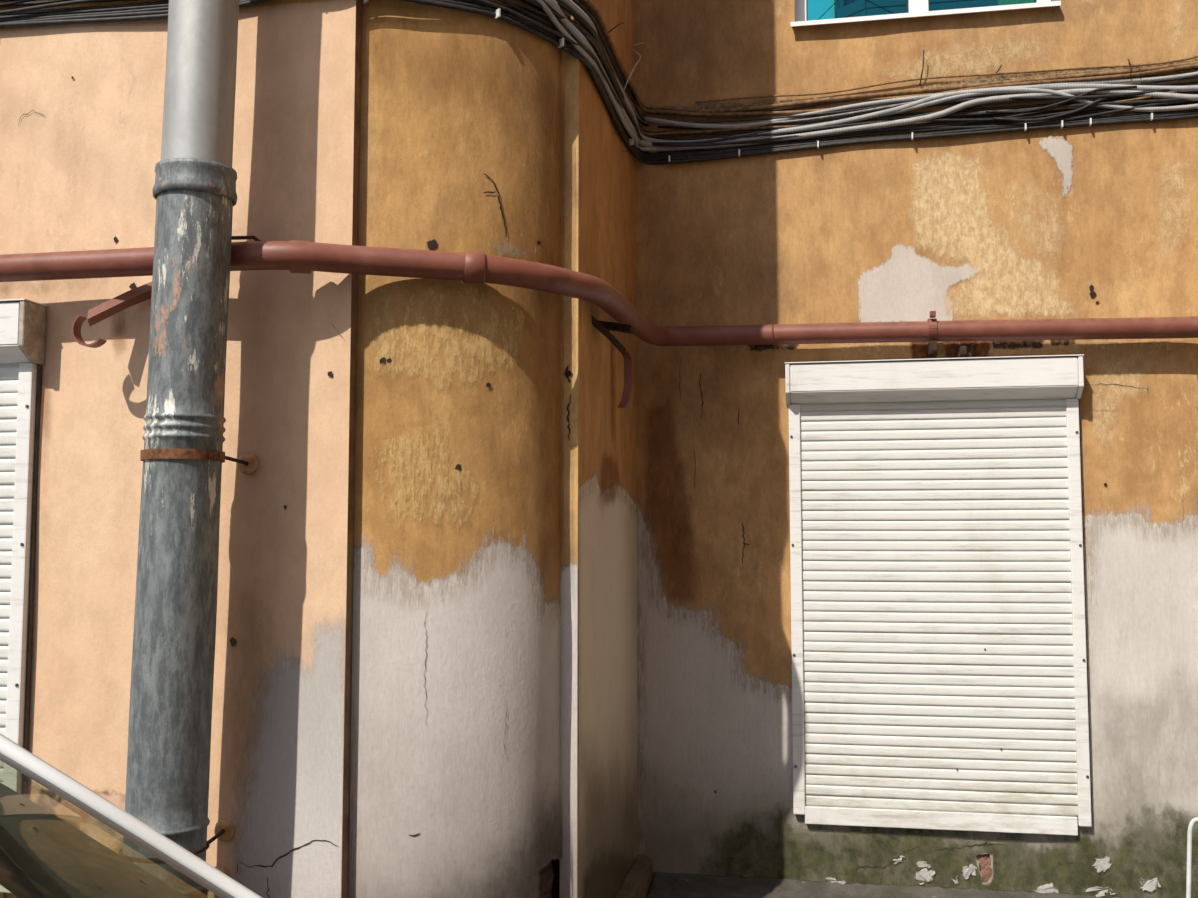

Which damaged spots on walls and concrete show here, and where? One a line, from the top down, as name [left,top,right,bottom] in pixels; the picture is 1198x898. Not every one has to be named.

peeling [1039,136,1073,197]
peeling [858,152,1074,322]
peeling [377,423,478,525]
peeling [234,471,1198,898]
crack [236,840,338,898]